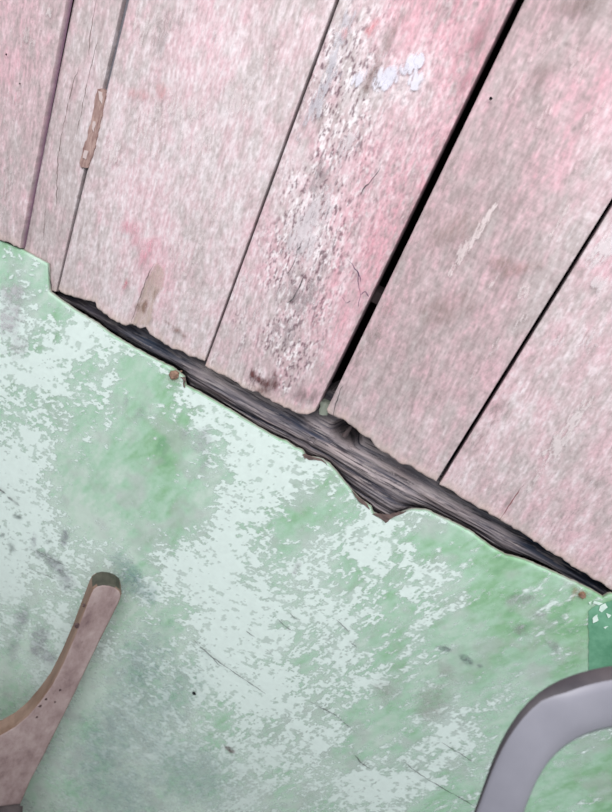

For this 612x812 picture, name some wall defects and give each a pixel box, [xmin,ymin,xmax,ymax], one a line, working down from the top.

peeling [351,53,425,91]
peeling [448,202,498,277]
peeling [543,397,593,462]
peeling [0,248,534,812]
peeling [514,571,583,637]
peeling [586,597,611,629]
crack [193,639,264,693]